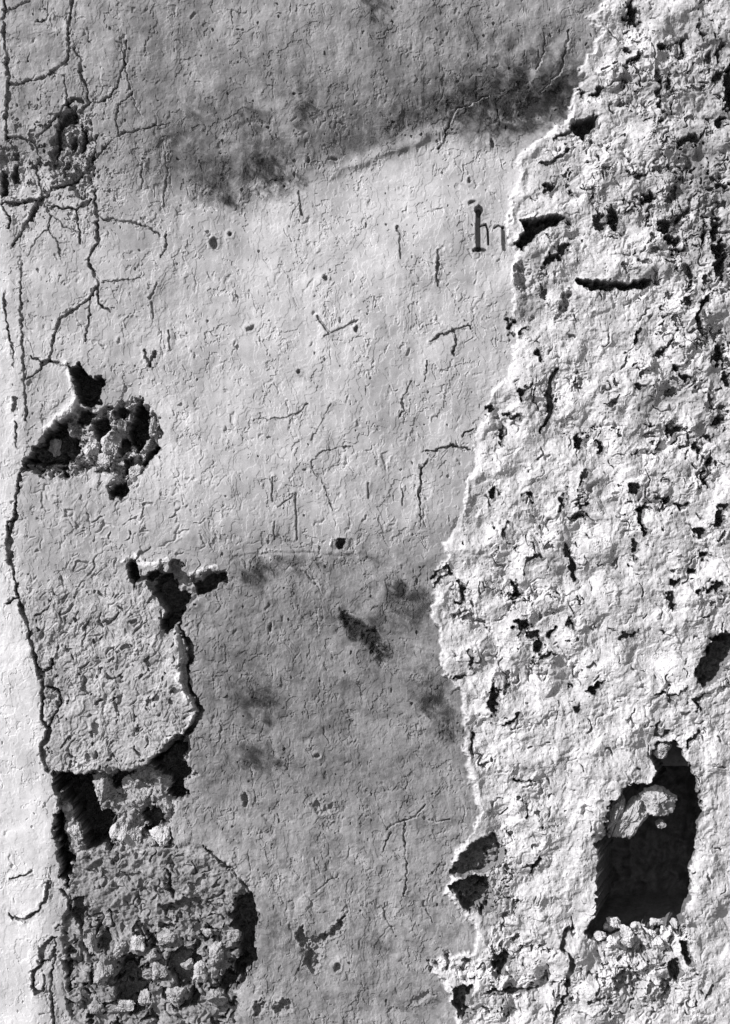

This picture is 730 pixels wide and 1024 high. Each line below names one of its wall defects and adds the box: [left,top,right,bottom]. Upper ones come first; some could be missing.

crack [1,0,171,774]
spalling [20,360,164,502]
spalling [128,560,227,634]
spalling [429,0,730,1024]
spalling [51,769,262,1024]
spalling [148,739,197,801]